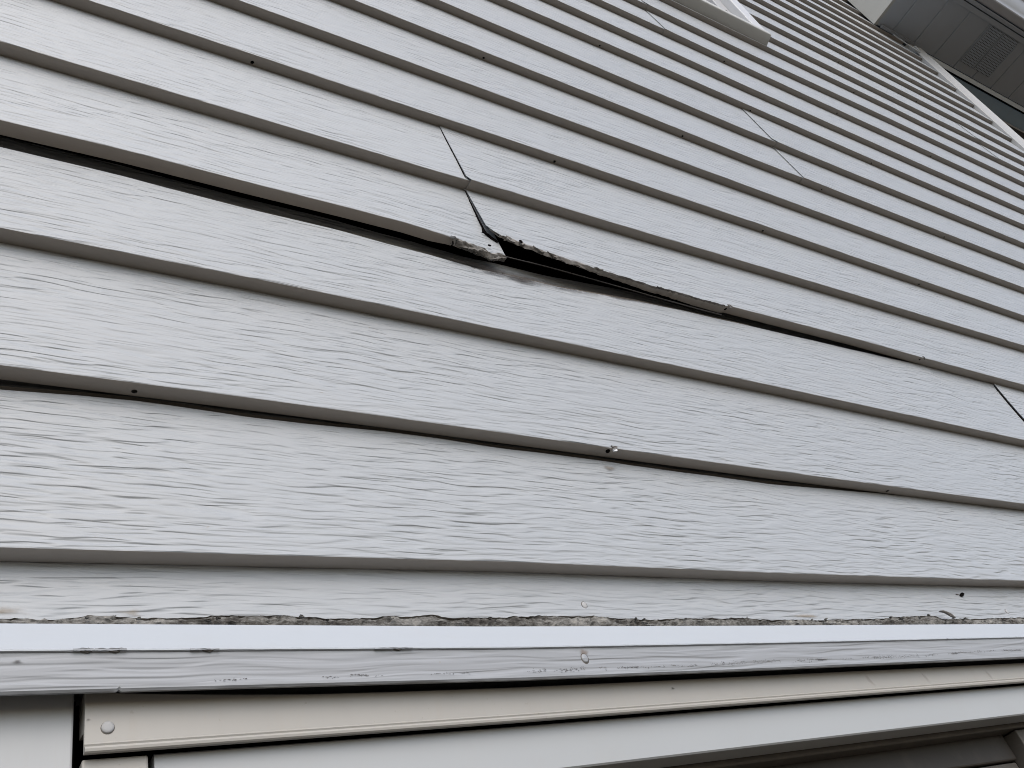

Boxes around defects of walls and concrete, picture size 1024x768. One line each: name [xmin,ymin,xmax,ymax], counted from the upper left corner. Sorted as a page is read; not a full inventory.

crack [441,130,498,243]
spalling [503,235,733,310]